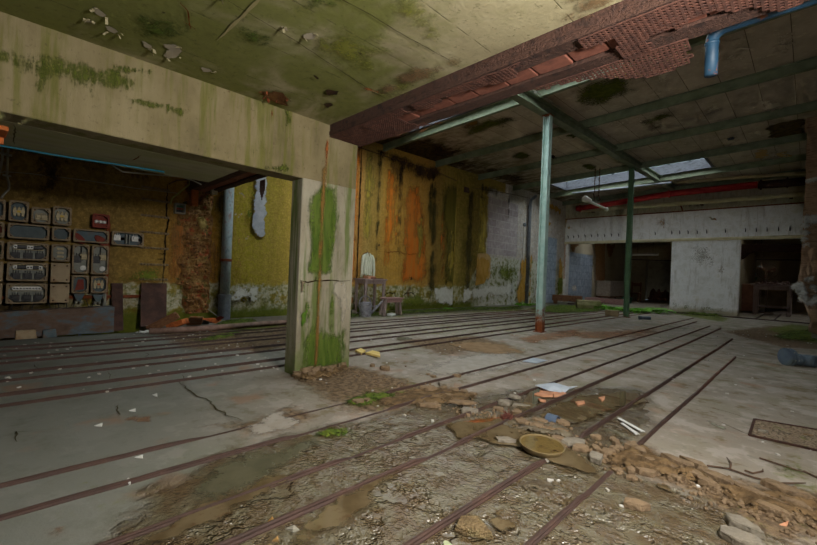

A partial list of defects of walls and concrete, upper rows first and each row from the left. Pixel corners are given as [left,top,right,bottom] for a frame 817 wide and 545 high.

water stain [363,135,524,289]
spalling [175,180,214,314]
peeling [435,286,453,305]
peeling [463,253,515,302]
crack [179,375,243,421]